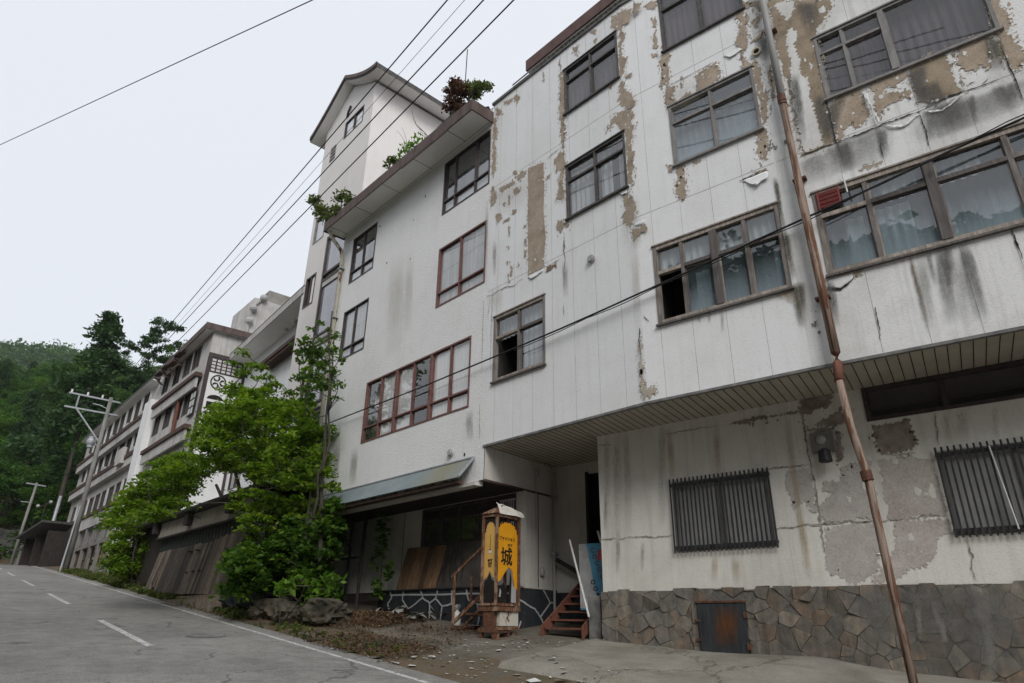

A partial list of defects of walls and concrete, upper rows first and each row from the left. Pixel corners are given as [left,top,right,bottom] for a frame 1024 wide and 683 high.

peeling [486,44,580,283]
peeling [604,0,724,242]
peeling [734,0,1024,174]
leakage [911,250,981,303]
peeling [636,336,659,400]
crack [603,533,672,541]
peeling [732,394,954,586]
crack [759,406,948,551]